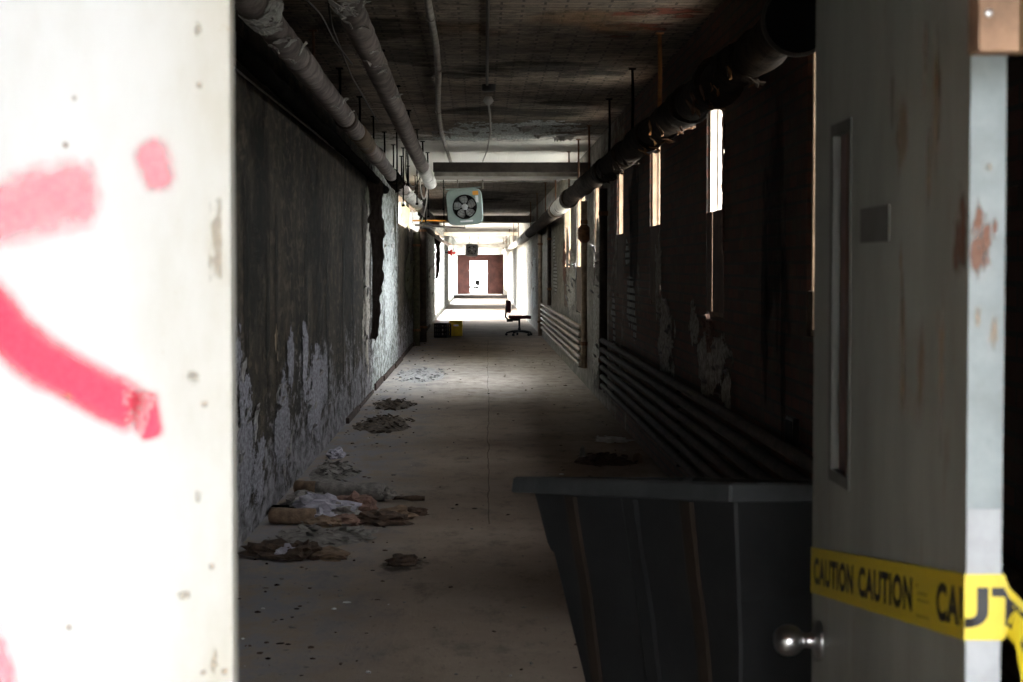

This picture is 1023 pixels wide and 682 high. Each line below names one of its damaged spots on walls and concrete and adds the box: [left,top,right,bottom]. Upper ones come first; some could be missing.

peeling [362,179,416,374]
corrosion [953,196,998,277]
peeling [236,317,329,521]